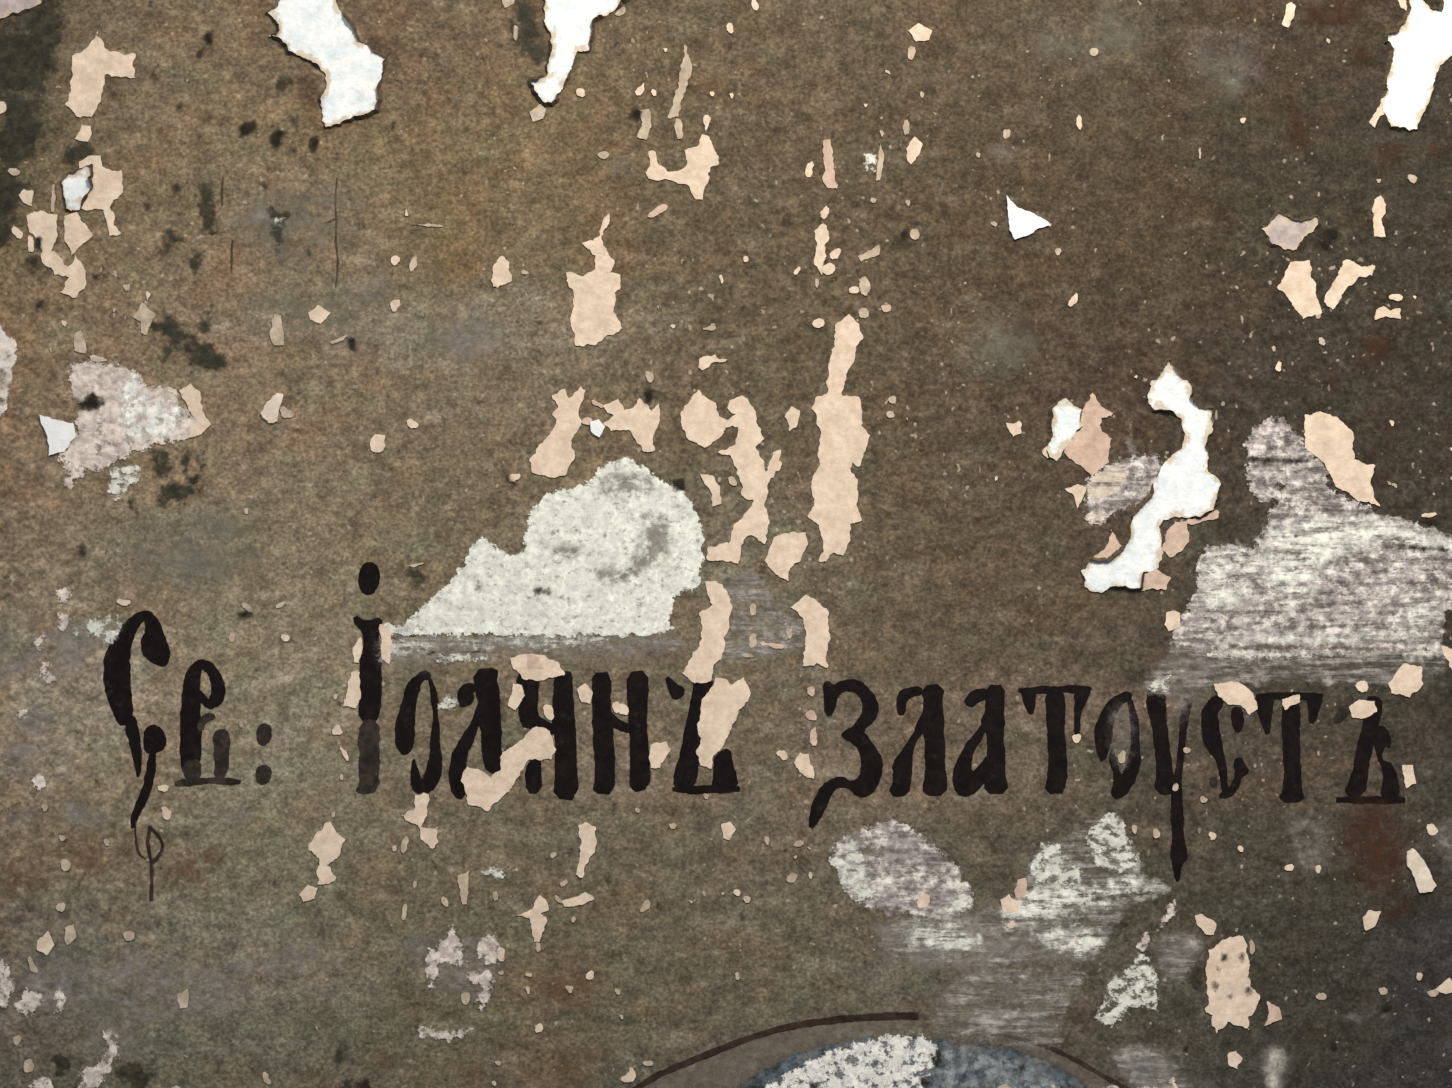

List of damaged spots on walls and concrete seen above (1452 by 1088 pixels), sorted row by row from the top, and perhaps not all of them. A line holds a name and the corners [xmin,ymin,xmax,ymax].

peeling [265,0,387,129]
peeling [527,0,630,122]
peeling [1369,0,1452,132]
peeling [566,214,622,347]
peeling [793,206,841,288]
peeling [40,392,104,456]
peeling [680,245,891,581]
peeling [1042,358,1223,593]
flaking render [1304,411,1397,506]
peeling [1349,681,1377,719]
peeling [1388,663,1423,697]
peeling [1194,914,1282,1034]